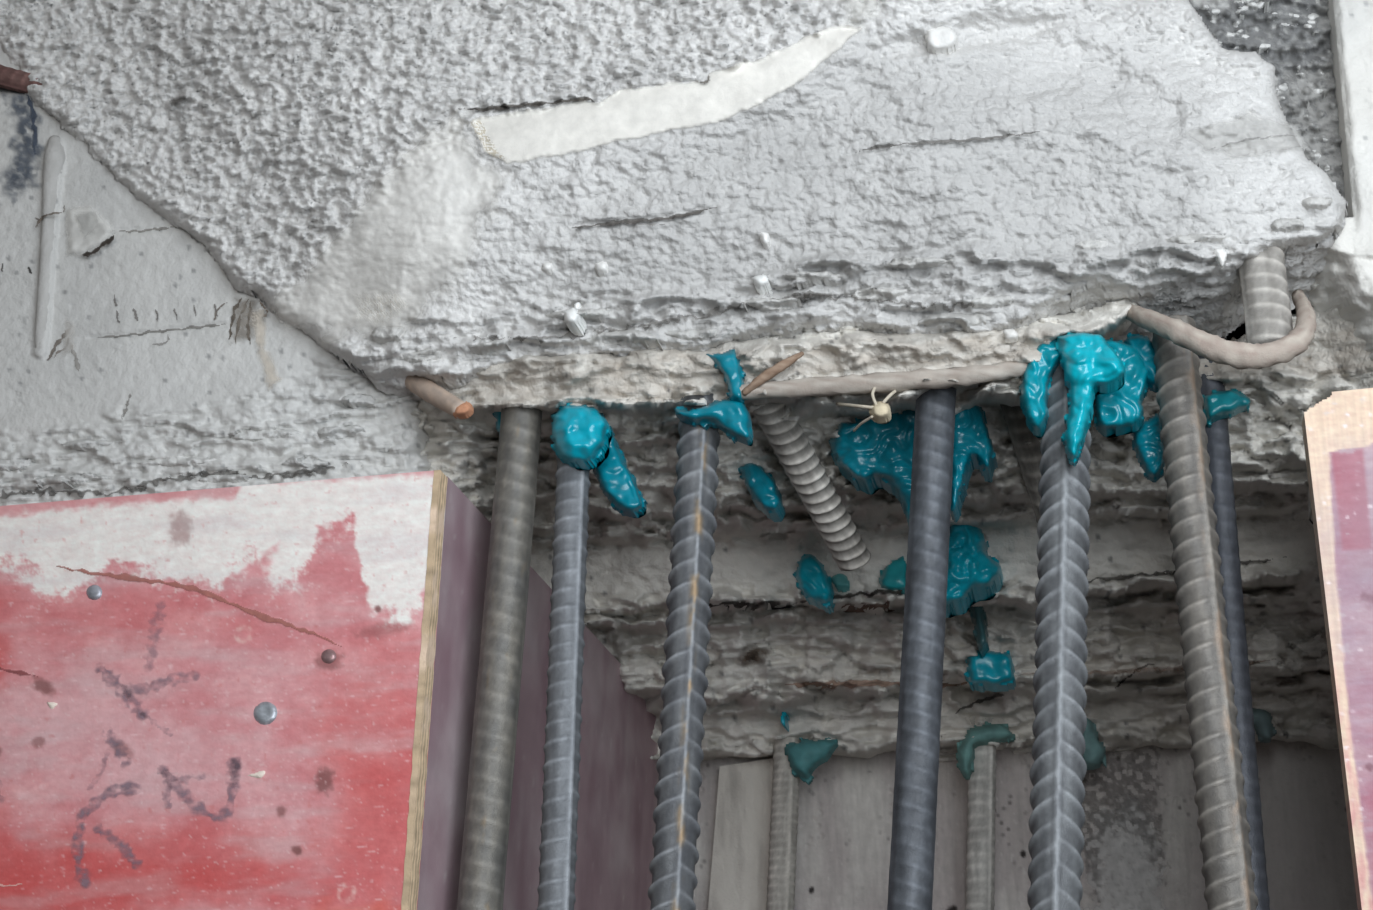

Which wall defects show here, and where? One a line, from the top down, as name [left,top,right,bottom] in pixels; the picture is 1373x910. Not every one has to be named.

corrosion [0,64,42,94]
spalling [0,0,1348,445]
spalling [0,455,348,499]
spalling [456,406,543,910]
spalling [537,457,591,910]
spalling [648,393,721,910]
spalling [740,361,1028,910]
spalling [1000,364,1092,910]
spalling [1113,322,1270,910]